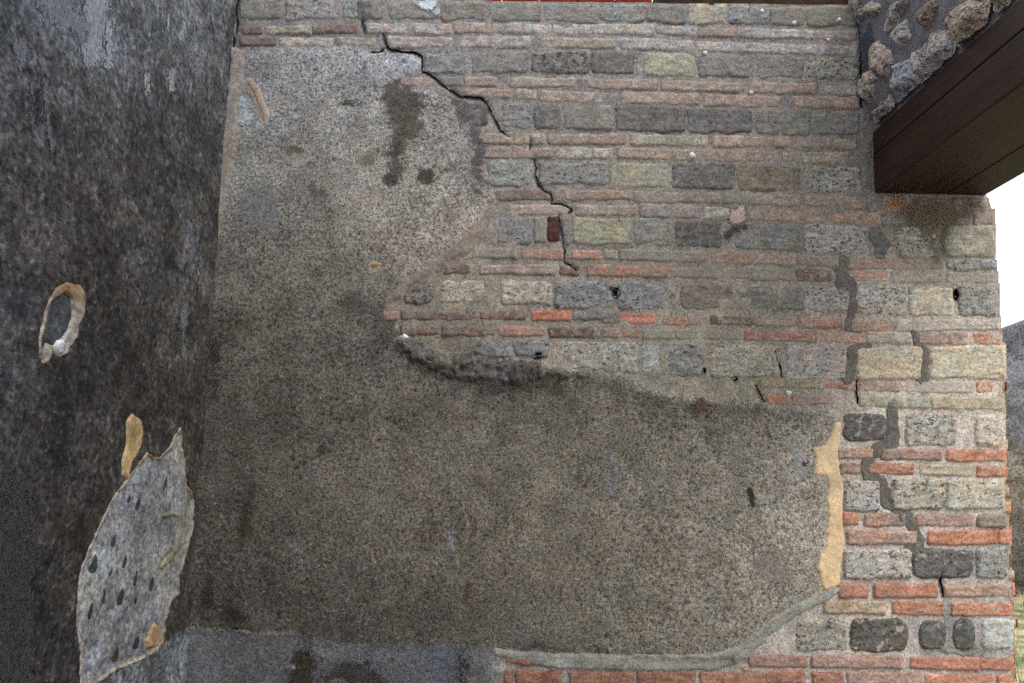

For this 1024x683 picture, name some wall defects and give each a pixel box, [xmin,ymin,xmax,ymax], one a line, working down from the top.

leakage [376,79,429,187]
leakage [417,168,436,185]
crack [361,18,577,271]
leakage [448,97,490,194]
spalling [39,282,86,364]
spalling [76,414,195,683]
flaking render [813,422,844,590]